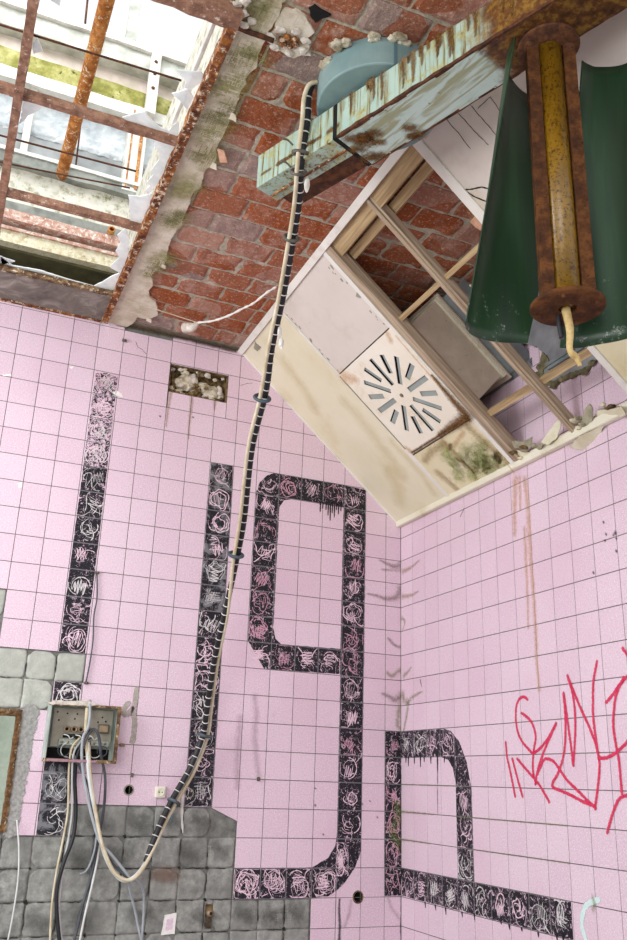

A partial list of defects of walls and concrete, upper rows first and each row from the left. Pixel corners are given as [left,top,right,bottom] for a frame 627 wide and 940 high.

flaking render [108,0,331,327]